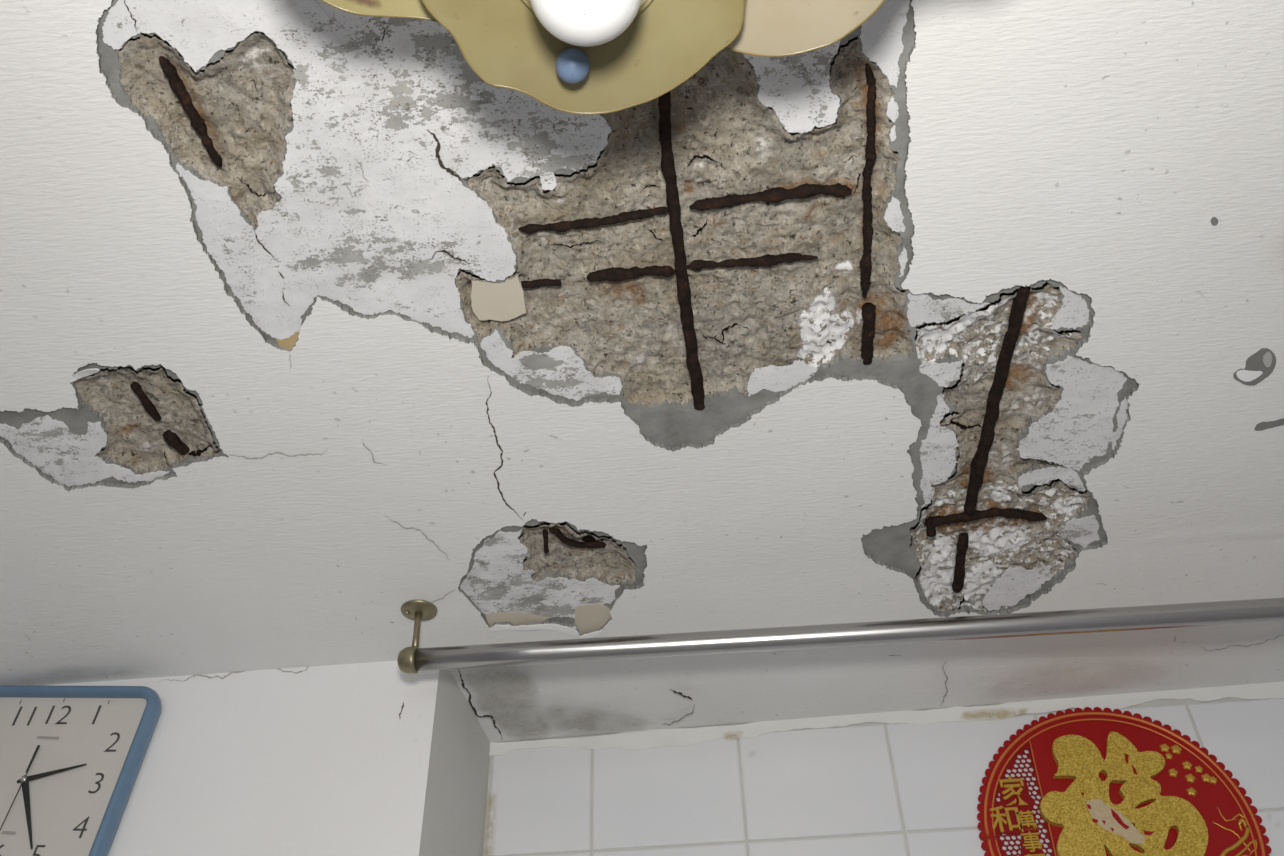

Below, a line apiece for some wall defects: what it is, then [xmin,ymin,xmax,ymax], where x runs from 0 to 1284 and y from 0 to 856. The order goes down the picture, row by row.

spalling [0,363,223,488]
crack [486,383,526,521]
spalling [98,0,1137,614]
peeling [1233,348,1276,386]
spalling [459,519,647,638]
rust [932,500,1037,533]